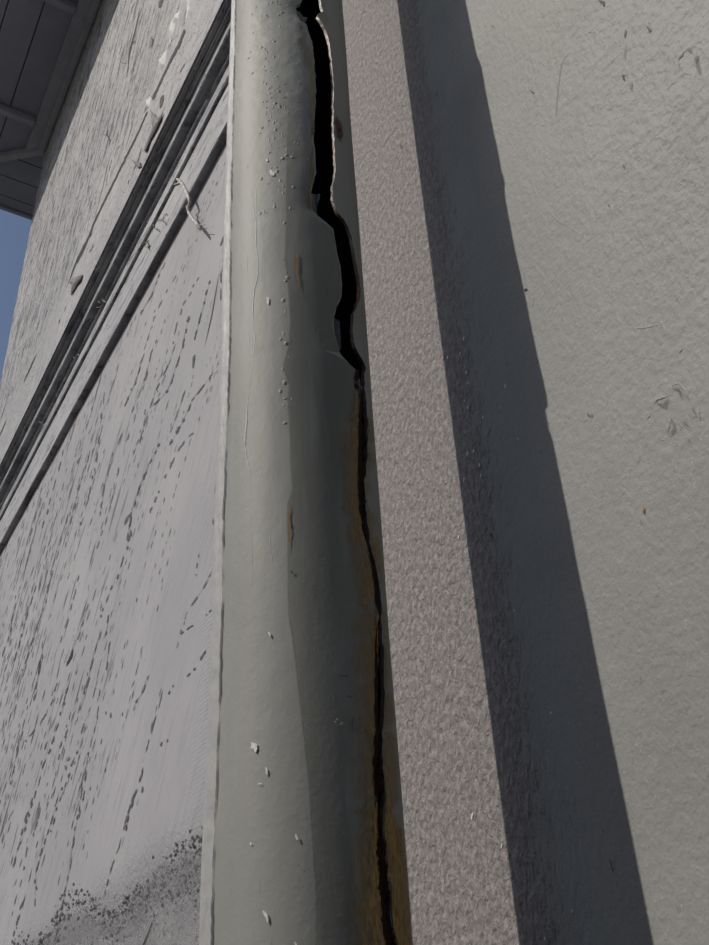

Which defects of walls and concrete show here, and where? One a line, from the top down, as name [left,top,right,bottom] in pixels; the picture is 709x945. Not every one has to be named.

crack [333,318,341,351]
mould [13,826,202,945]
crack [355,367,396,945]
corrosion [349,399,412,945]